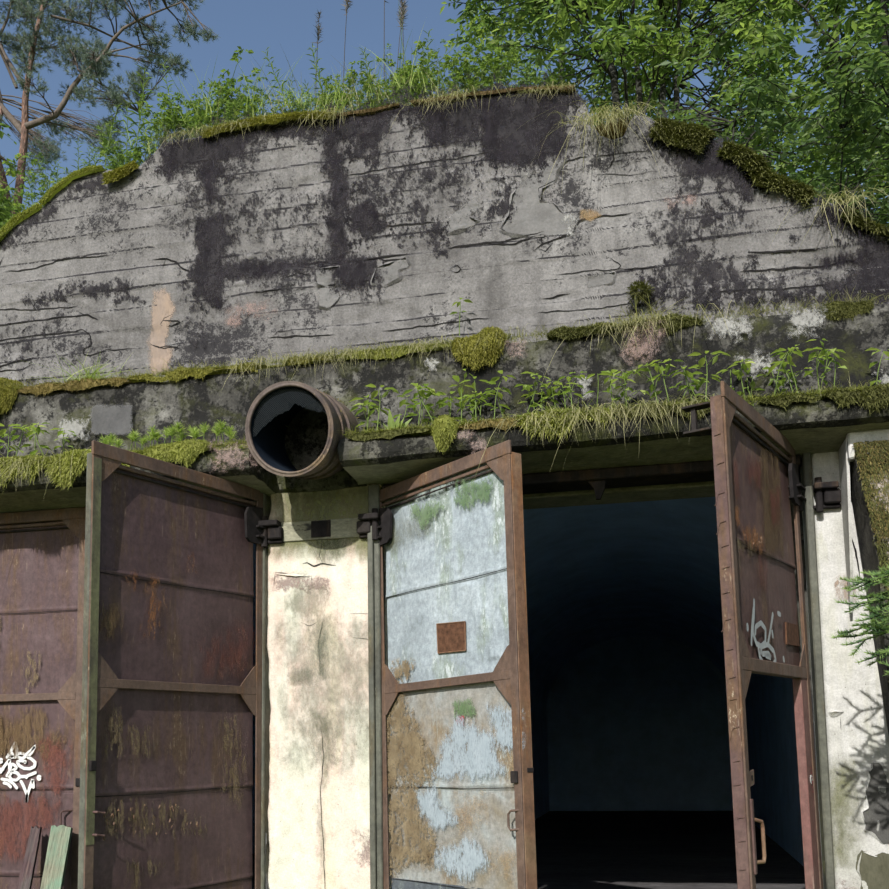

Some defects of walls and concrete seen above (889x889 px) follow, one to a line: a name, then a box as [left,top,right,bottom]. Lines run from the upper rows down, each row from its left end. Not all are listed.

leakage [144,71,602,351]
crack [0,255,108,272]
crack [447,212,632,273]
crack [538,258,650,313]
crack [715,248,852,293]
crack [0,306,181,372]
leakage [276,486,368,523]
leakage [277,537,368,555]
corrosion [0,707,65,759]
corrosion [386,658,441,883]
corrosion [104,799,207,839]
peeling [856,761,889,889]